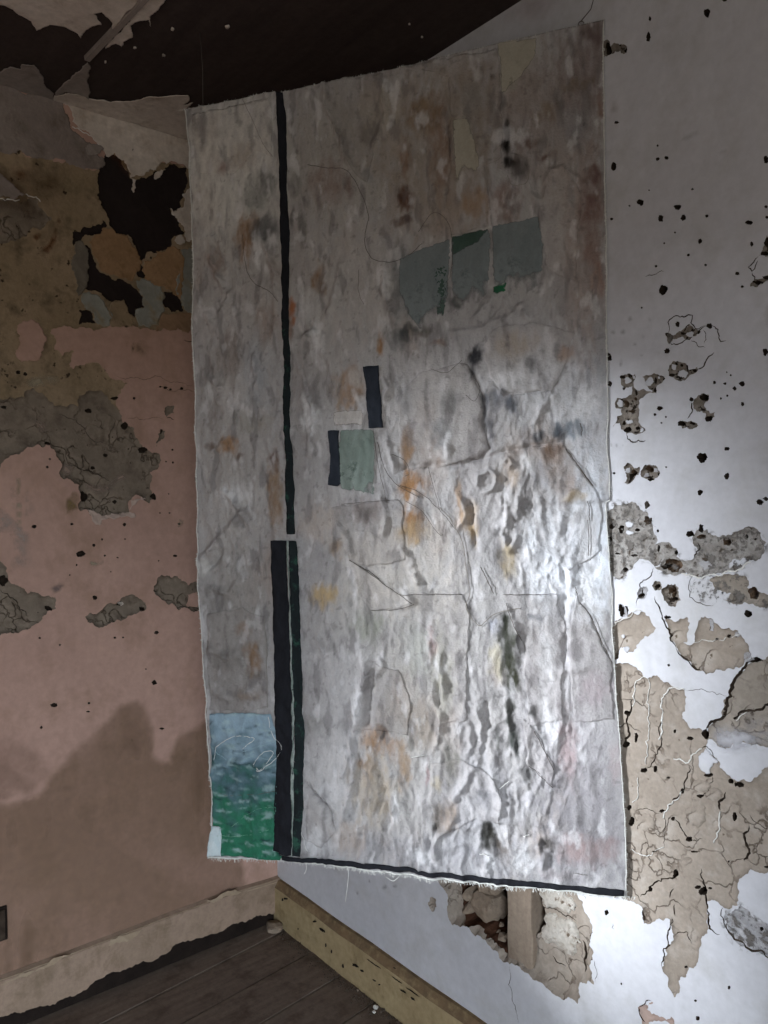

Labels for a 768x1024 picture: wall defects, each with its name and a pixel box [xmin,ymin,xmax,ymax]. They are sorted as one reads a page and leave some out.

peeling [0,0,166,49]
peeling [0,63,194,525]
flaking render [613,314,724,443]
flaking render [624,463,660,484]
flaking render [0,562,57,635]
flaking render [85,594,147,628]
flaking render [154,575,199,612]
crack [636,570,762,764]
flaking render [607,501,768,997]
spalling [428,879,594,1004]